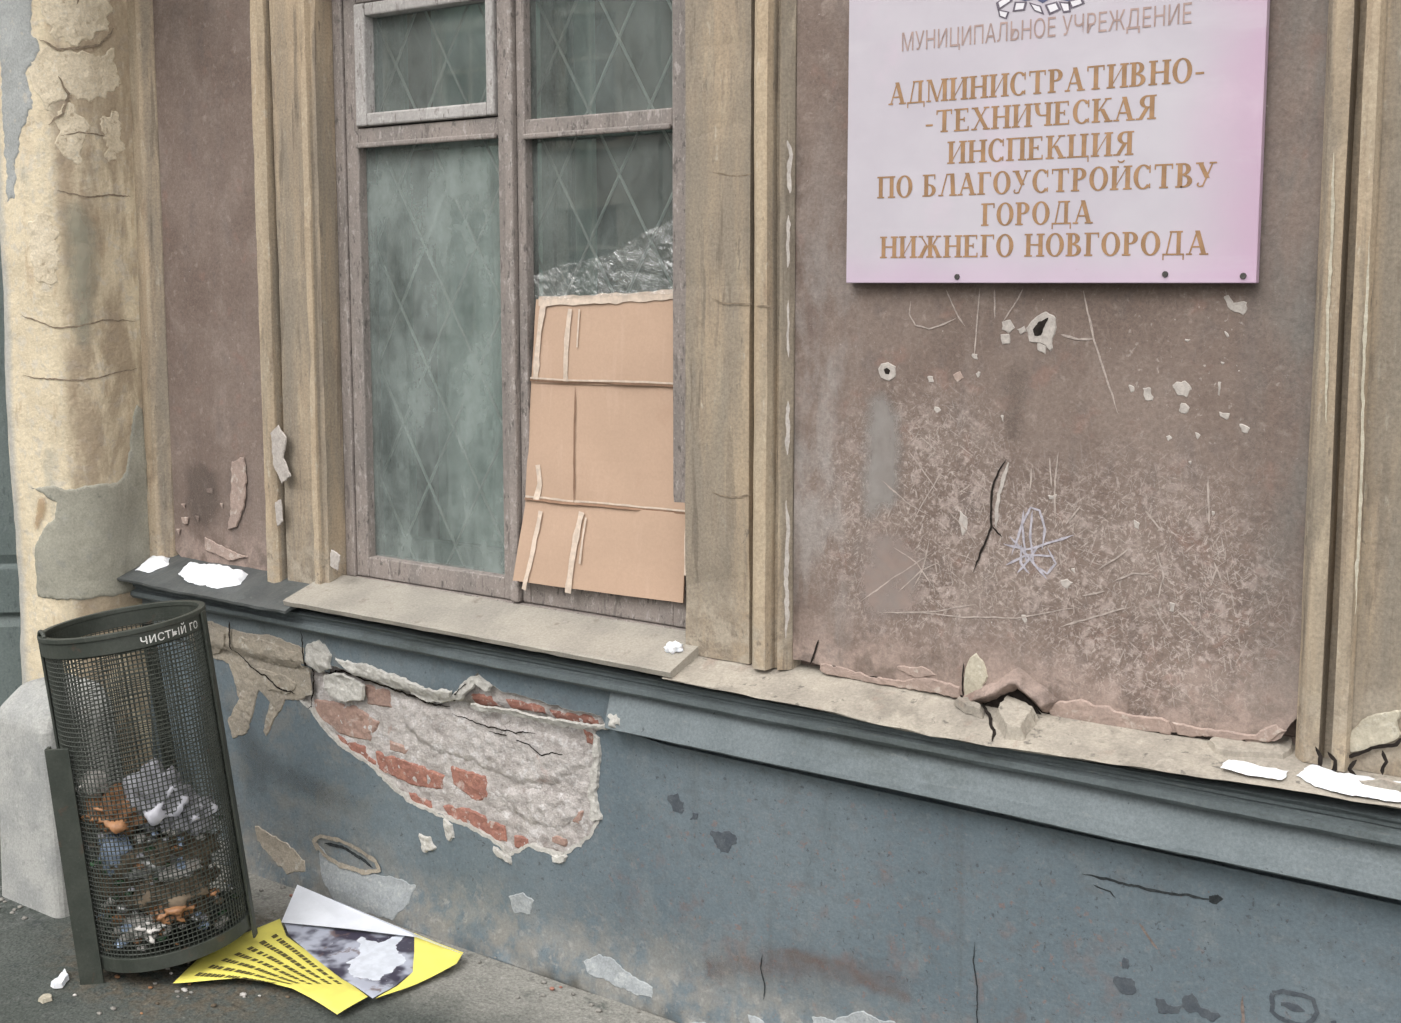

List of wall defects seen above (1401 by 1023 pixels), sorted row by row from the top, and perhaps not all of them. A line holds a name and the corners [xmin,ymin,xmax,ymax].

peeling [27,0,126,165]
peeling [28,211,60,289]
hole [1001,312,1057,354]
peeling [270,425,291,526]
crack [973,460,1009,572]
peeling [330,549,341,571]
flaking render [190,621,620,865]
peeling [1350,710,1401,753]
peeling [255,826,306,875]
crack [1083,874,1223,904]
peeling [584,954,653,998]
peeling [812,1011,896,1023]